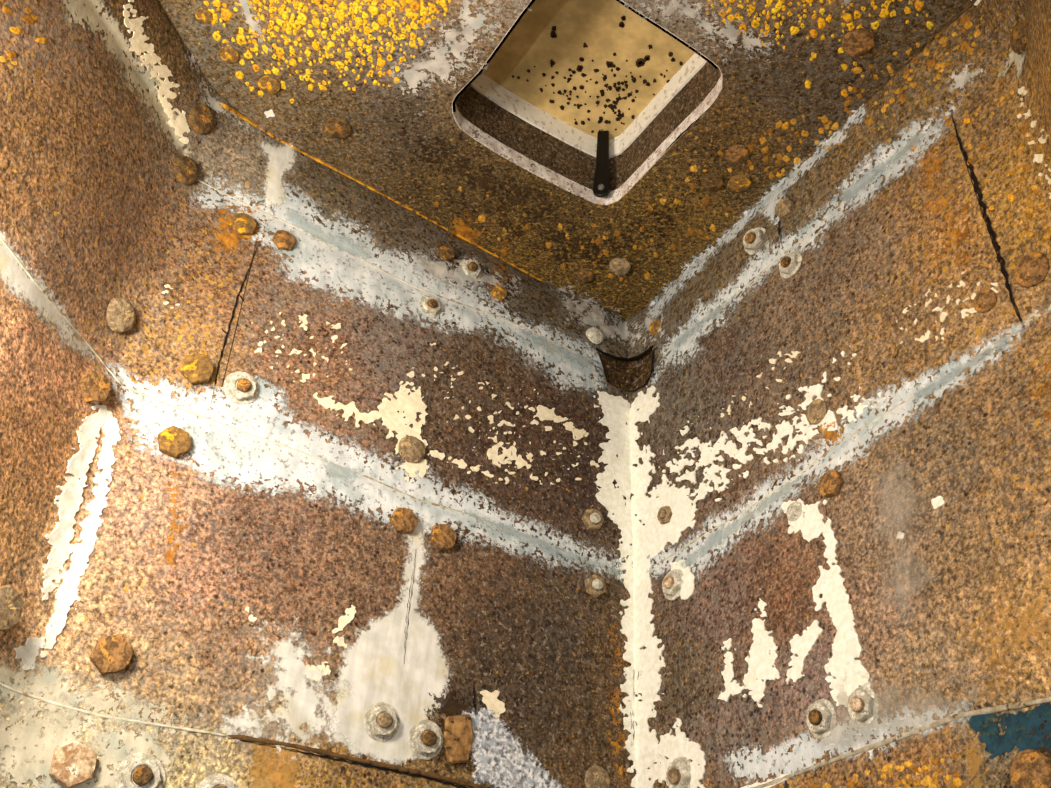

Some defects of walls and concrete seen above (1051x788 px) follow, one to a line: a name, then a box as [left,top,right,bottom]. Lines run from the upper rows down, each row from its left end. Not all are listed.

peeling [123,0,190,144]
corrosion [203,0,451,104]
corrosion [381,0,983,303]
corrosion [904,79,1051,289]
crack [951,114,1024,329]
crack [211,246,258,403]
peeling [254,312,352,383]
peeling [14,402,122,671]
peeling [313,346,886,788]
peeling [308,662,331,681]
crack [229,738,468,788]
peeling [967,702,1051,759]